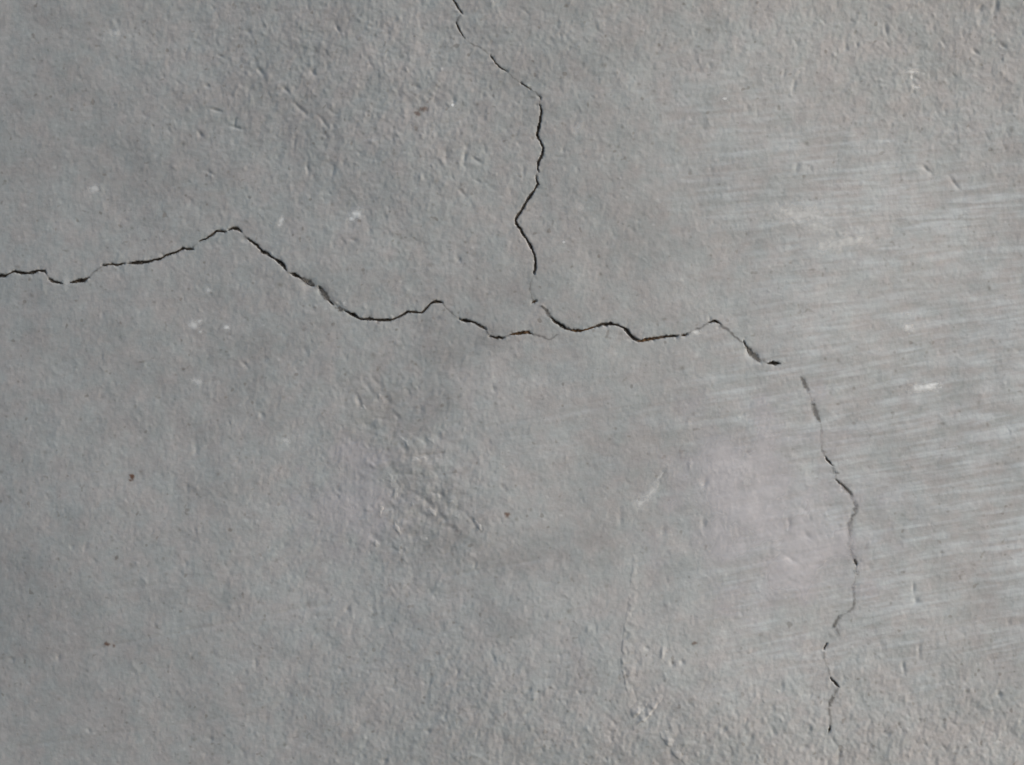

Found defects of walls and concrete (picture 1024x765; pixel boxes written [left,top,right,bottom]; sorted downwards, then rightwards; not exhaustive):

crack [491,56,544,273]
crack [0,227,687,342]
crack [709,320,779,365]
crack [801,378,820,420]
crack [826,458,857,589]